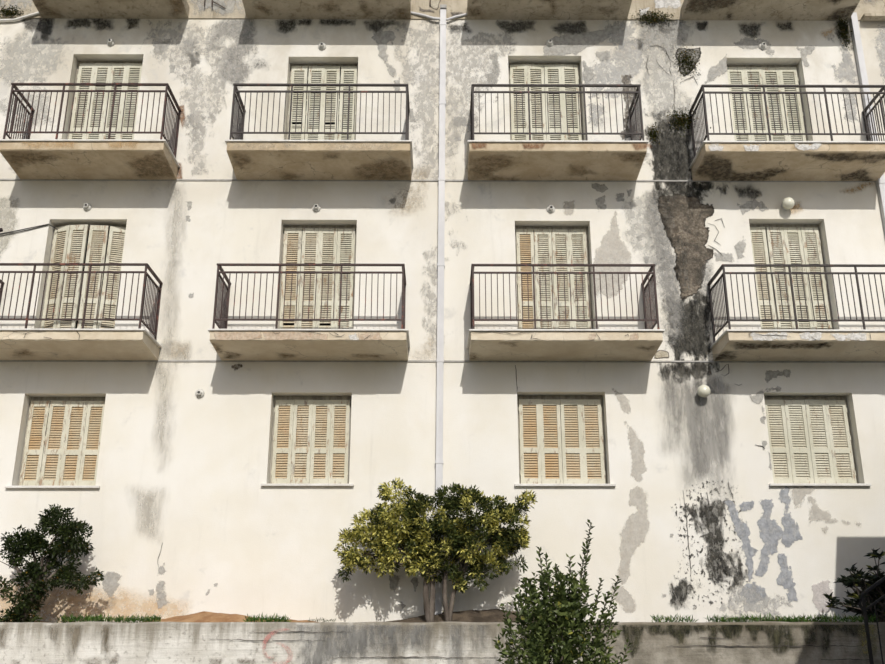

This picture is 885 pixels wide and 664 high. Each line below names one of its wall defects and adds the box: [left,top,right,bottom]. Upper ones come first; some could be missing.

leakage [147,0,266,174]
peeling [372,31,400,91]
leakage [279,6,534,181]
leakage [553,22,587,35]
peeling [543,0,681,140]
spalling [675,47,701,76]
leakage [806,153,885,181]
leakage [622,0,871,656]
leakage [102,625,117,663]
peeling [611,391,649,613]
peeling [724,486,860,603]
peeling [812,580,834,612]